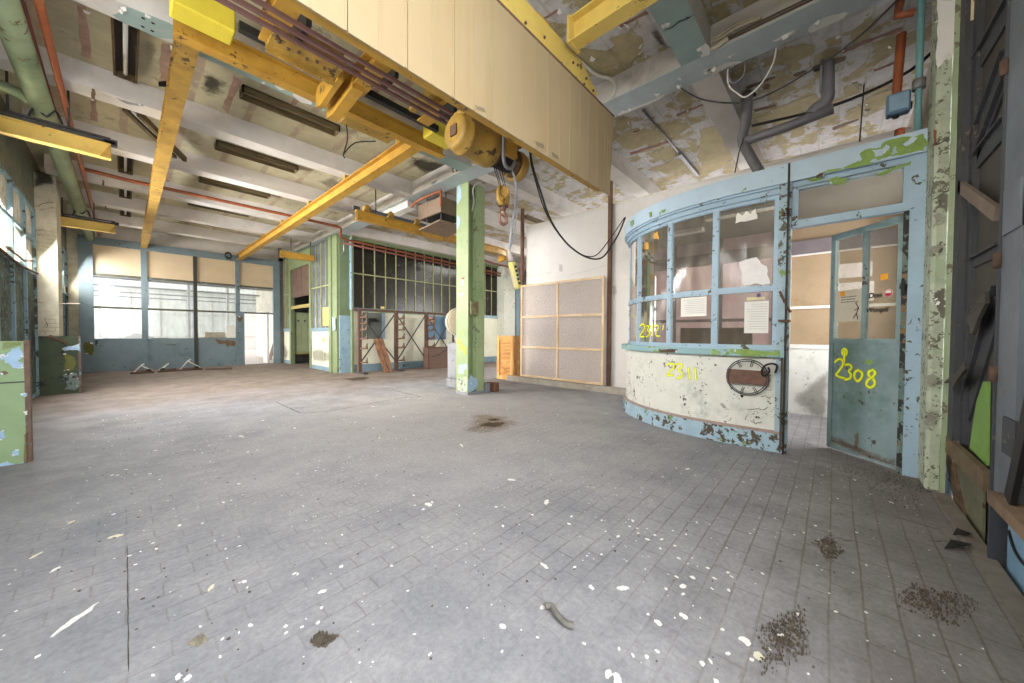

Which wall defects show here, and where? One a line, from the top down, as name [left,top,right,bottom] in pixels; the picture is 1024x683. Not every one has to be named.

peeling [609,11,649,60]
peeling [697,43,741,76]
peeling [742,12,903,130]
peeling [934,0,955,68]
peeling [616,127,688,174]
peeling [687,126,733,178]
peeling [806,134,928,185]
spalling [934,290,946,318]